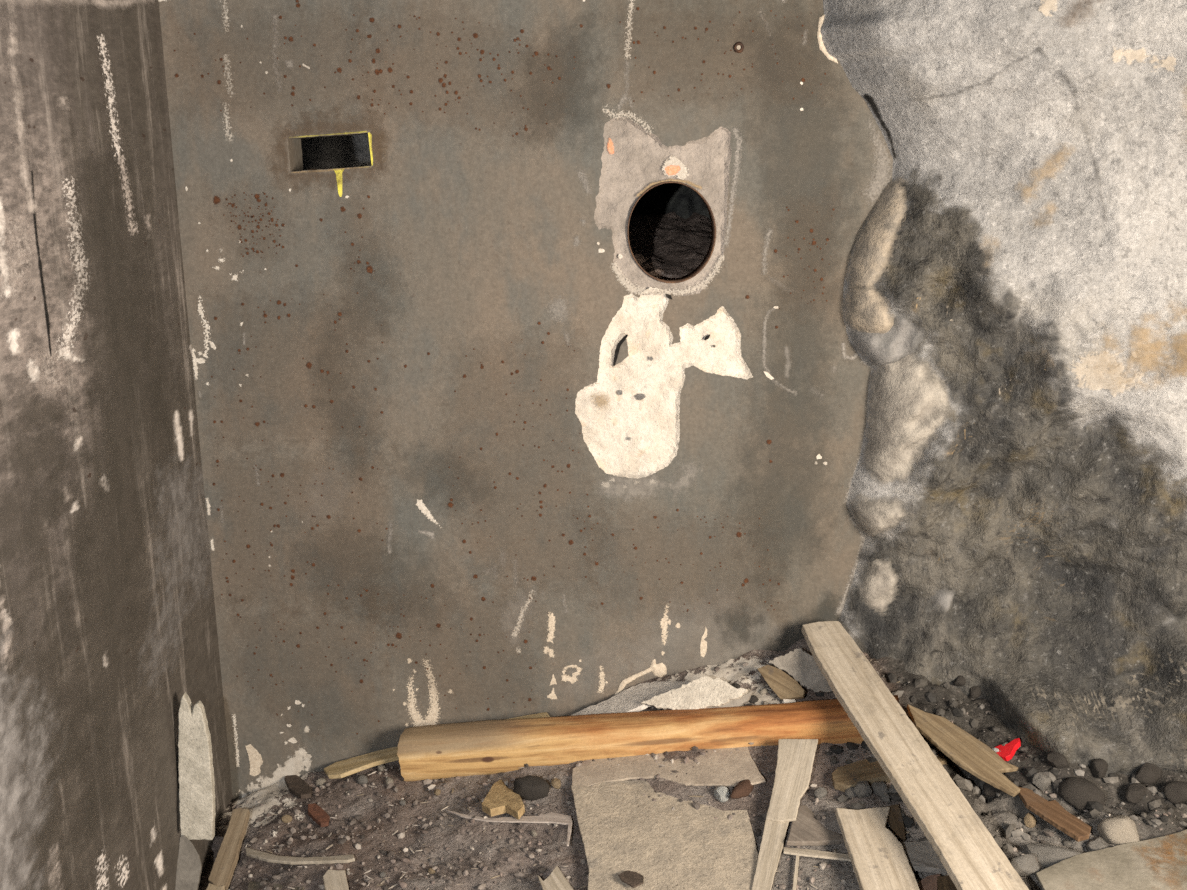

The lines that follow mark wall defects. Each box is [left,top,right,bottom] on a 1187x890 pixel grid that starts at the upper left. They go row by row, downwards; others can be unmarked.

rust [214,192,284,258]
spalling [575,104,753,498]
damp [780,170,1187,778]
peeling [245,744,263,776]